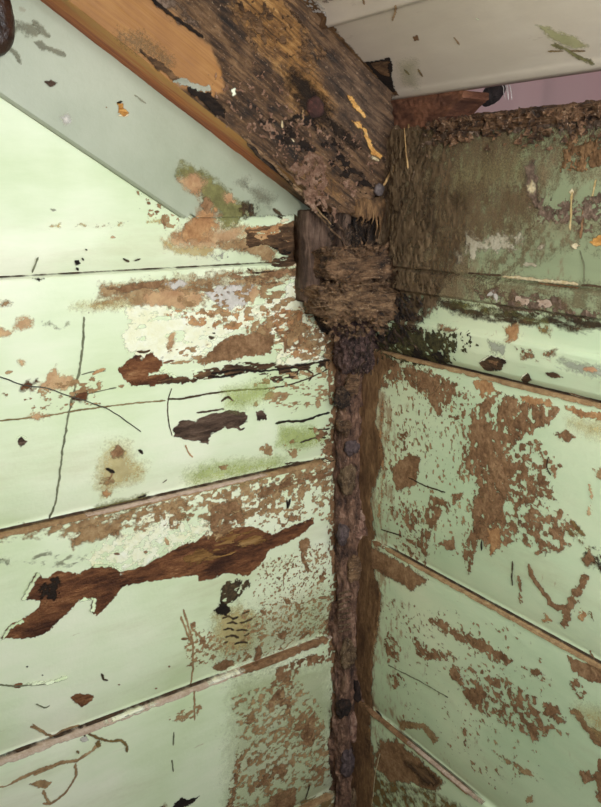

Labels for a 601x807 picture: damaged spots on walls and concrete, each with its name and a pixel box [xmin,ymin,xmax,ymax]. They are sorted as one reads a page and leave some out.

water stain [429,189,601,319]
peeling [118,350,176,388]
crack [0,317,334,518]
peeling [173,408,267,458]
peeling [1,518,314,639]
peeling [0,675,68,688]
peeling [71,693,94,707]
spalling [162,796,199,807]